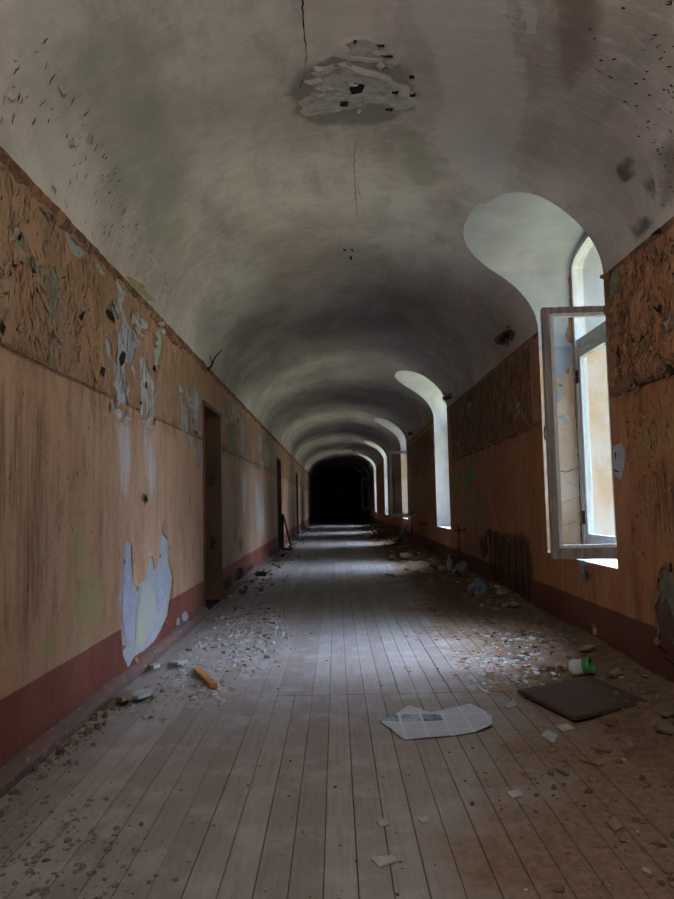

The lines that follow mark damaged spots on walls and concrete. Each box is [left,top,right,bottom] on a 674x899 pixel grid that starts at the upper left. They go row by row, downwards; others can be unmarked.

crack [299,0,307,88]
flaking render [0,146,307,473]
flaking render [600,217,674,335]
peeling [117,519,189,672]
flaking render [651,557,674,665]